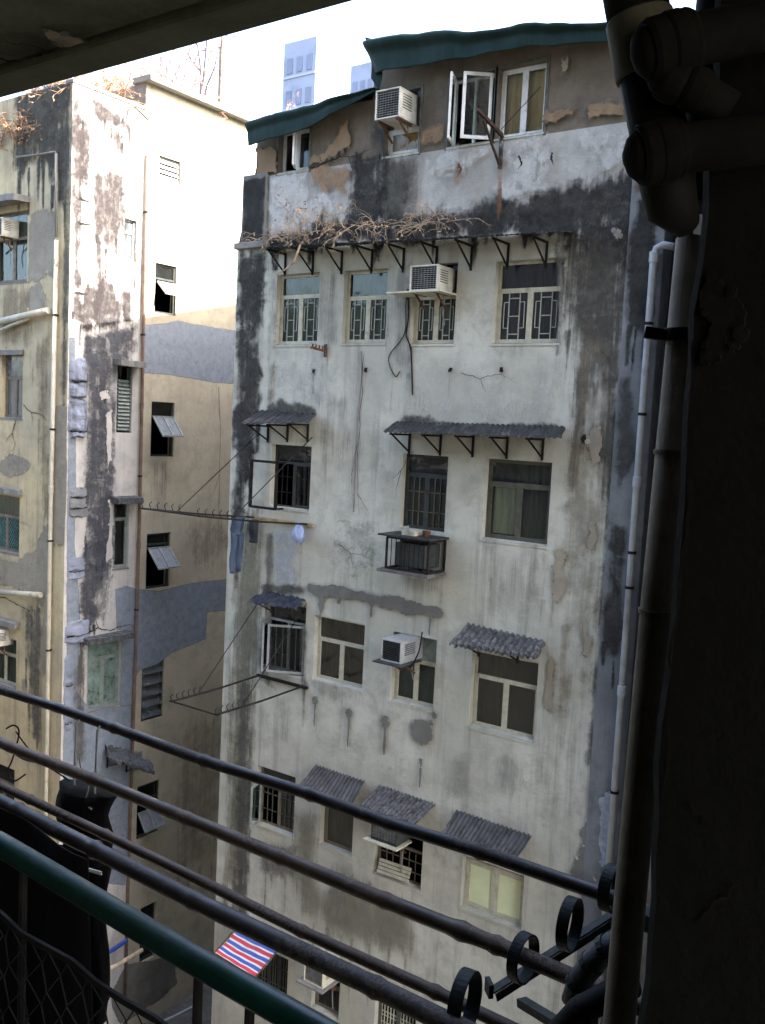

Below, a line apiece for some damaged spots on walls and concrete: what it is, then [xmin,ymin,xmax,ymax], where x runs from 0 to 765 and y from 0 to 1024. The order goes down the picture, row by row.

peeling [255,117,351,235]
peeling [421,124,488,174]
peeling [542,106,575,124]
peeling [576,97,626,170]
damp [13,78,137,635]
peeling [0,451,30,478]
damp [228,133,656,835]
peeling [551,548,567,604]
damp [224,844,249,914]